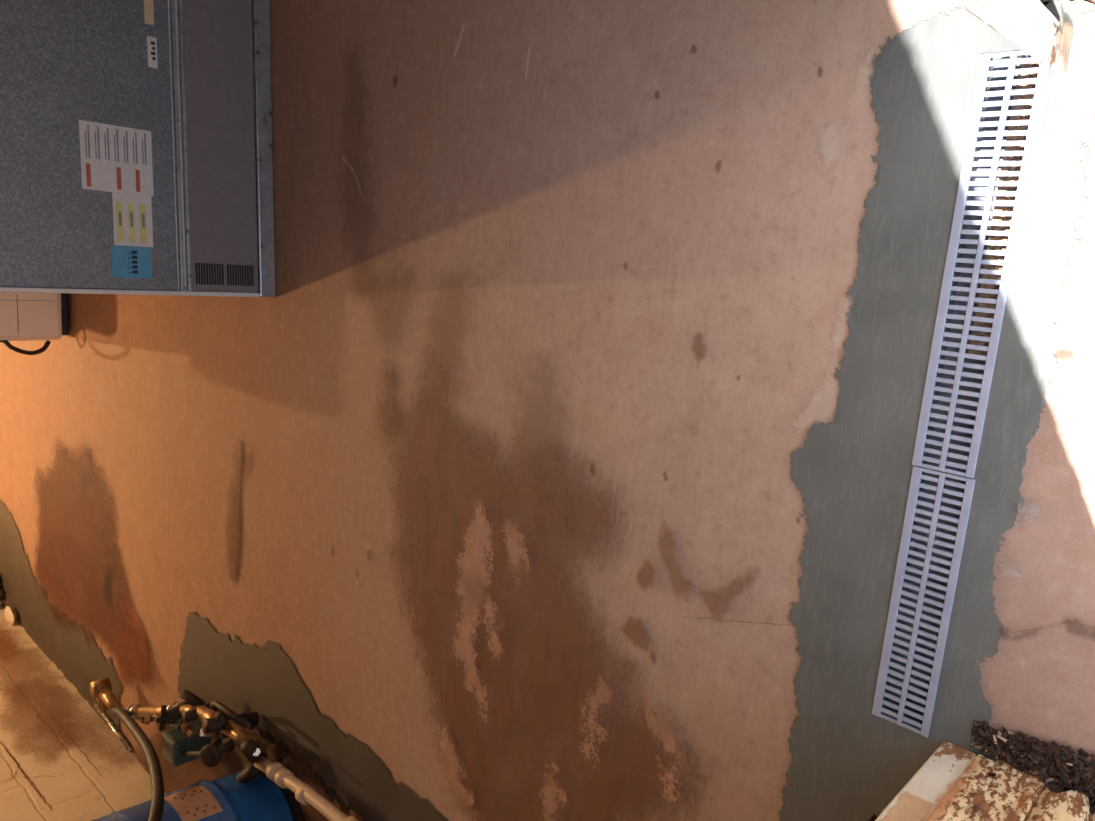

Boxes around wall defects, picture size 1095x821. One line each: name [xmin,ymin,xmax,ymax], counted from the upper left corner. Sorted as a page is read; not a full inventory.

damp [35,445,151,681]
damp [375,365,698,821]